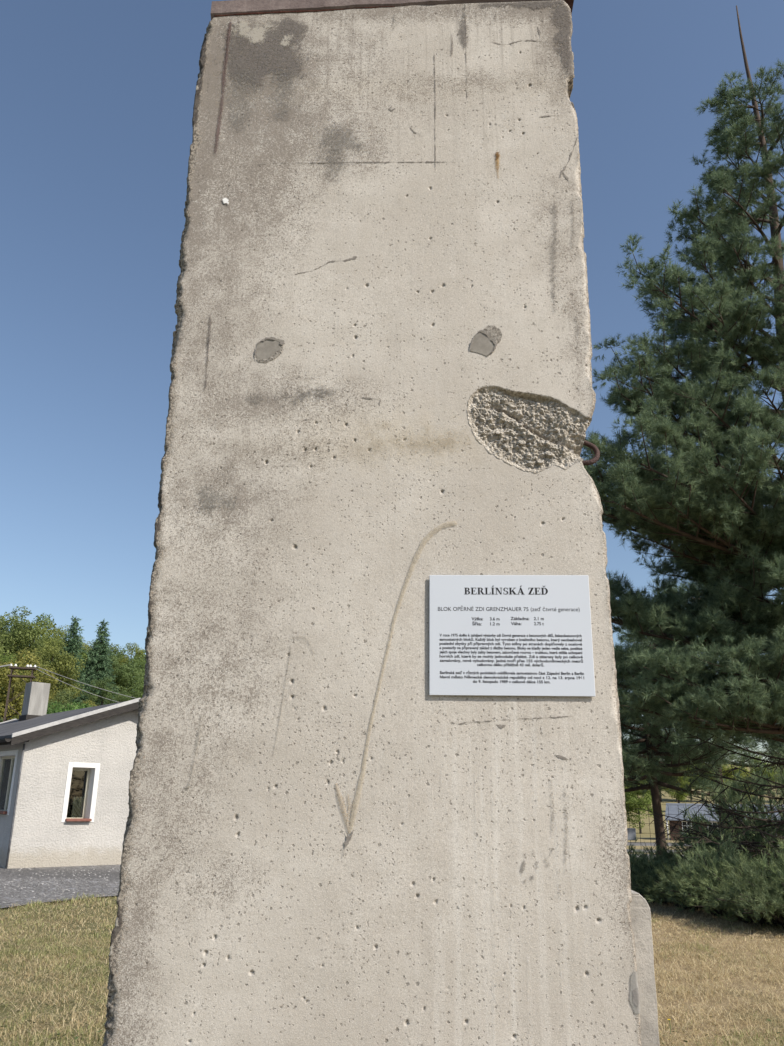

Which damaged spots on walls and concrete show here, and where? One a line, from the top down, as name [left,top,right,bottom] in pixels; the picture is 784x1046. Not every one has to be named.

damp [215,14,309,131]
spalling [483,325,502,343]
spalling [467,386,592,473]